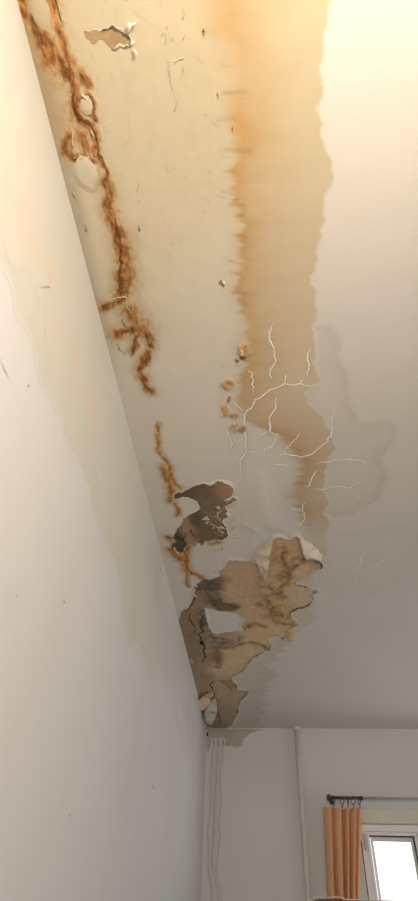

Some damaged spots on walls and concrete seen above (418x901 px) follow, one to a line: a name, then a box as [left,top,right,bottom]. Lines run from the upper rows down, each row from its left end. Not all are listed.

peeling [84,21,138,55]
corrosion [18,0,229,591]
damp [109,0,418,598]
crack [226,327,366,525]
peeling [171,479,323,728]